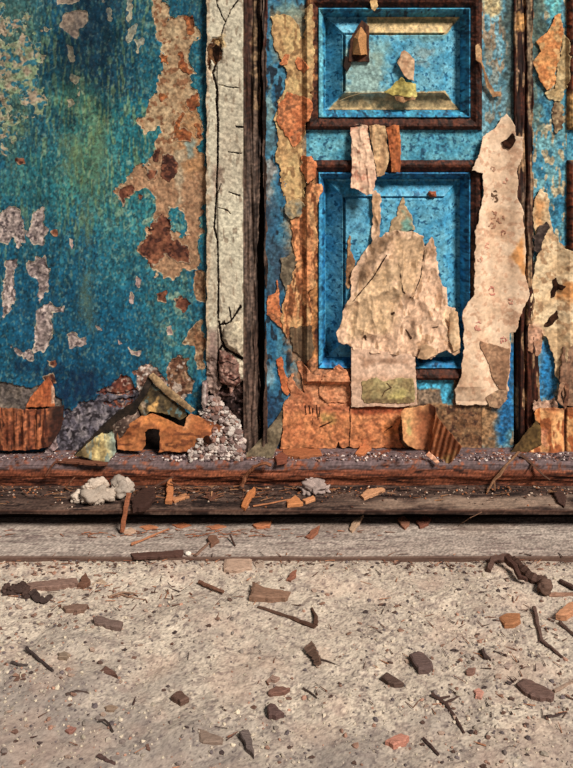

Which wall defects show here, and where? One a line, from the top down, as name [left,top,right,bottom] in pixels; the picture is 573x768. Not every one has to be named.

peeling [0,0,88,156]
peeling [533,14,572,134]
peeling [0,206,65,362]
flaking render [0,320,206,451]
peeling [113,0,207,303]
corrosion [145,148,179,182]
corrosion [138,214,191,268]
flaking render [208,381,243,428]
crack [212,64,243,386]
peeling [267,4,323,363]
peeling [528,324,542,356]
peeling [532,222,550,253]